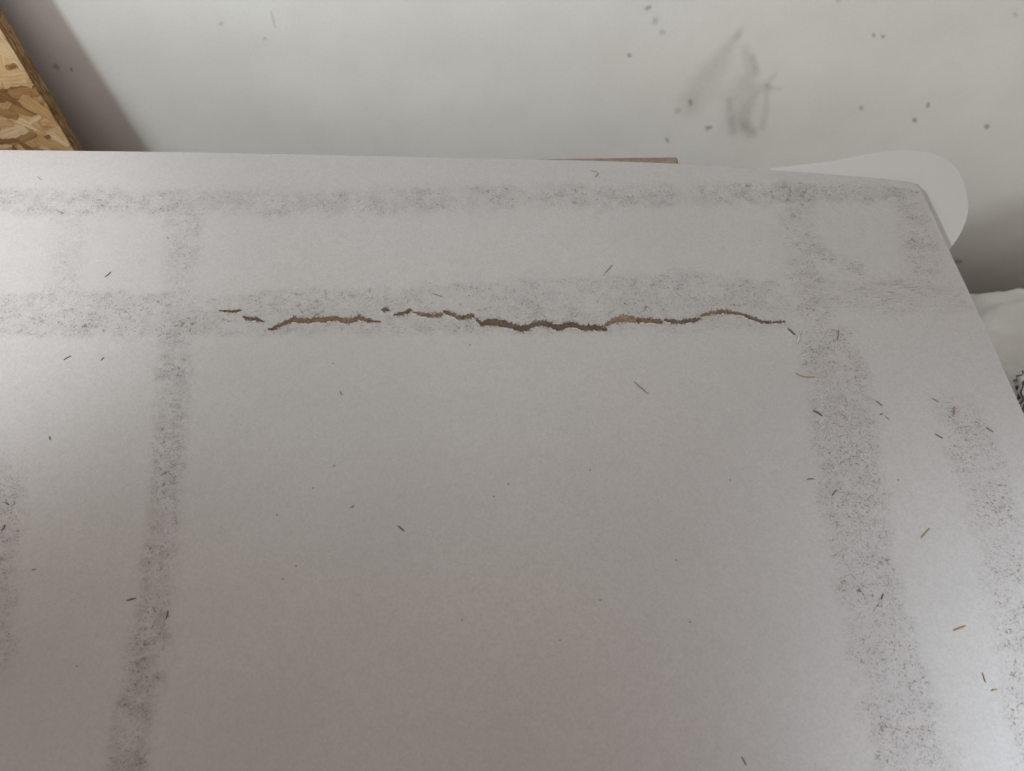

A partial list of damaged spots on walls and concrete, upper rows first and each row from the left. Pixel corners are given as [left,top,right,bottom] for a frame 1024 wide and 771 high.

crack [219,307,795,336]